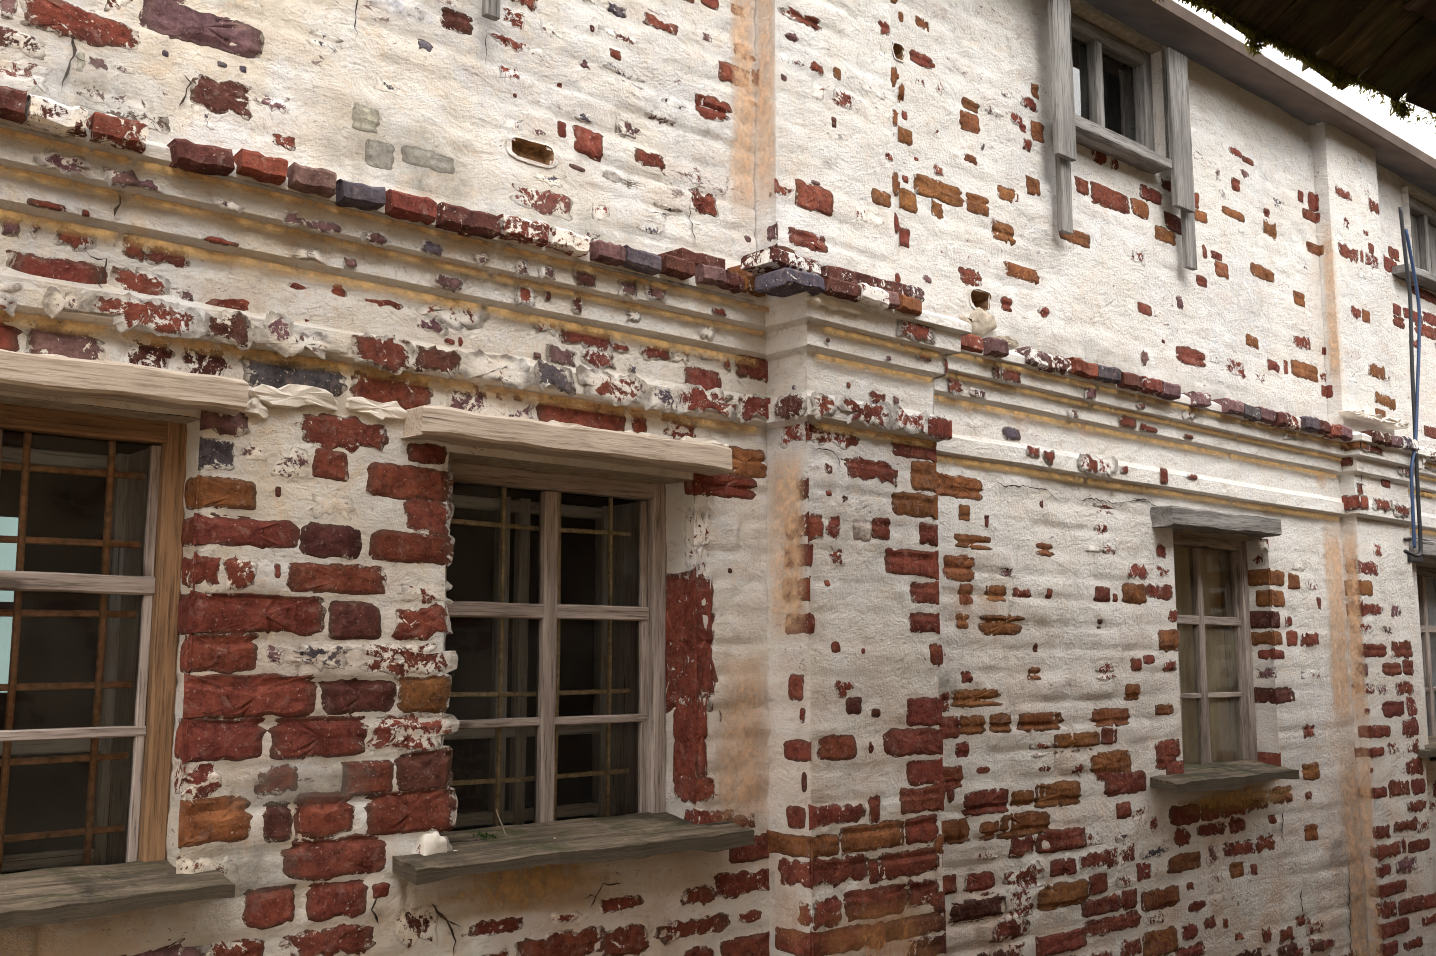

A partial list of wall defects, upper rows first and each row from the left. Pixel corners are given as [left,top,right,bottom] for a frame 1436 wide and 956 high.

peeling [0,0,290,135]
peeling [306,30,344,53]
peeling [33,148,164,194]
peeling [272,133,296,151]
peeling [351,102,455,174]
peeling [1074,146,1254,246]
peeling [0,197,1436,956]